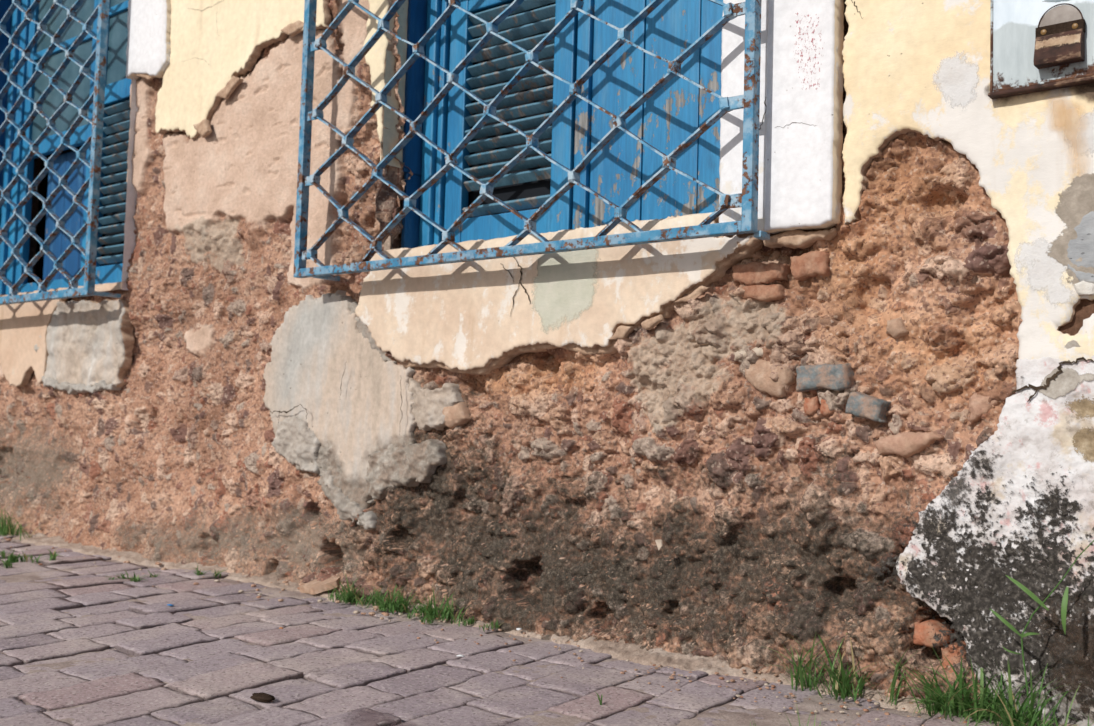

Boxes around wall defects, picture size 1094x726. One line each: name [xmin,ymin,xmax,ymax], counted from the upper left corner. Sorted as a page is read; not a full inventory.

spalling [306,0,381,268]
spalling [391,0,405,145]
peeling [933,52,979,108]
spalling [0,20,370,582]
crack [502,257,530,316]
spalling [284,123,1023,709]
crack [1012,357,1094,402]
peeling [1015,173,1094,349]
water stain [120,418,1094,725]